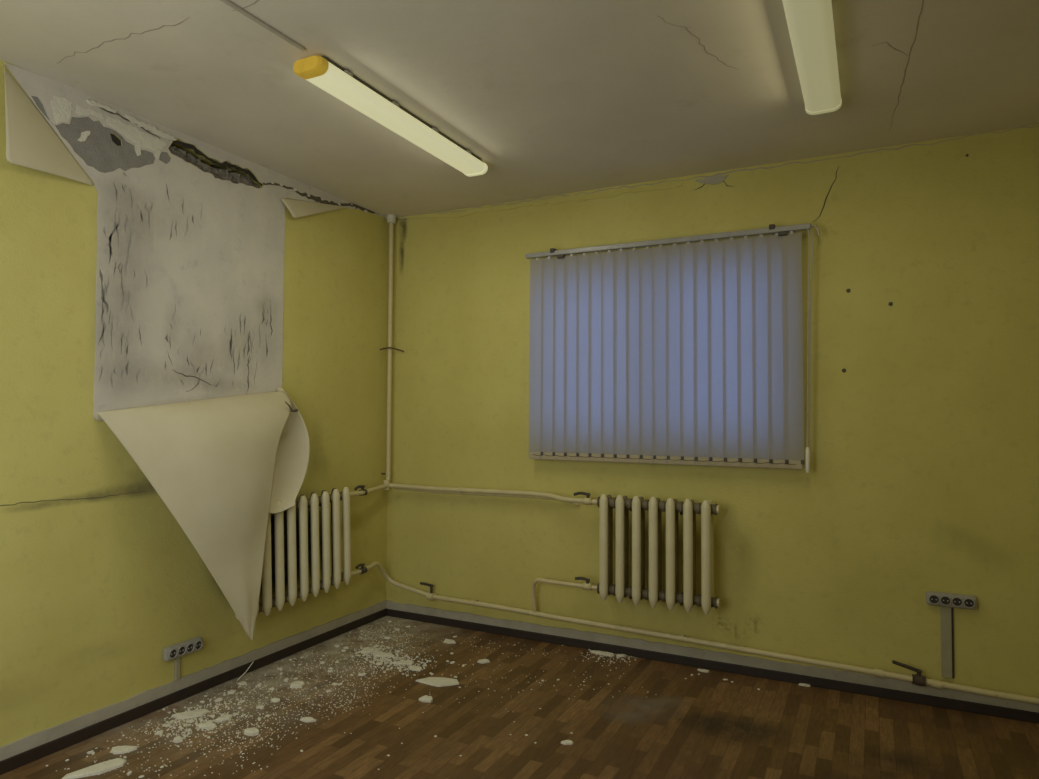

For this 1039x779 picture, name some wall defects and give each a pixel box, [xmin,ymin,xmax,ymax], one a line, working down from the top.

crack [872,0,924,131]
crack [99,107,160,138]
crack [263,181,387,219]
crack [813,167,839,222]
flaking render [4,63,386,419]